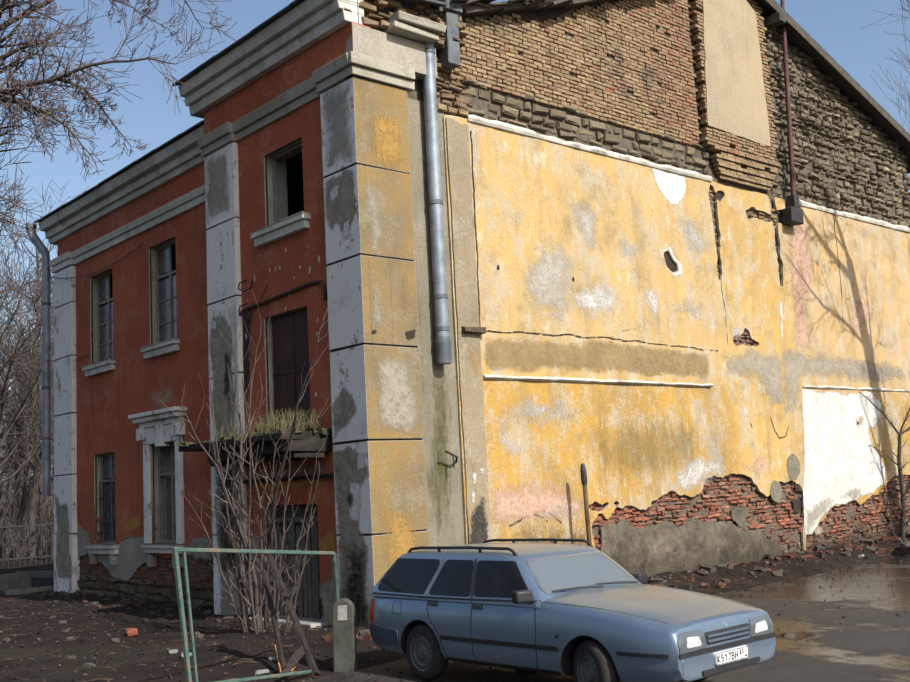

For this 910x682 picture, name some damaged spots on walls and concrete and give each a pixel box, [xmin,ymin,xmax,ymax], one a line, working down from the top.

peeling [325,169,355,240]
crack [470,130,728,351]
peeling [652,169,686,204]
spalling [663,247,682,276]
damp [486,340,708,376]
flaking render [733,329,758,346]
peeling [332,387,356,432]
peeling [55,496,72,579]
peeling [190,466,260,616]
peeling [319,446,370,629]
flaking render [490,438,910,578]
damp [342,545,368,627]